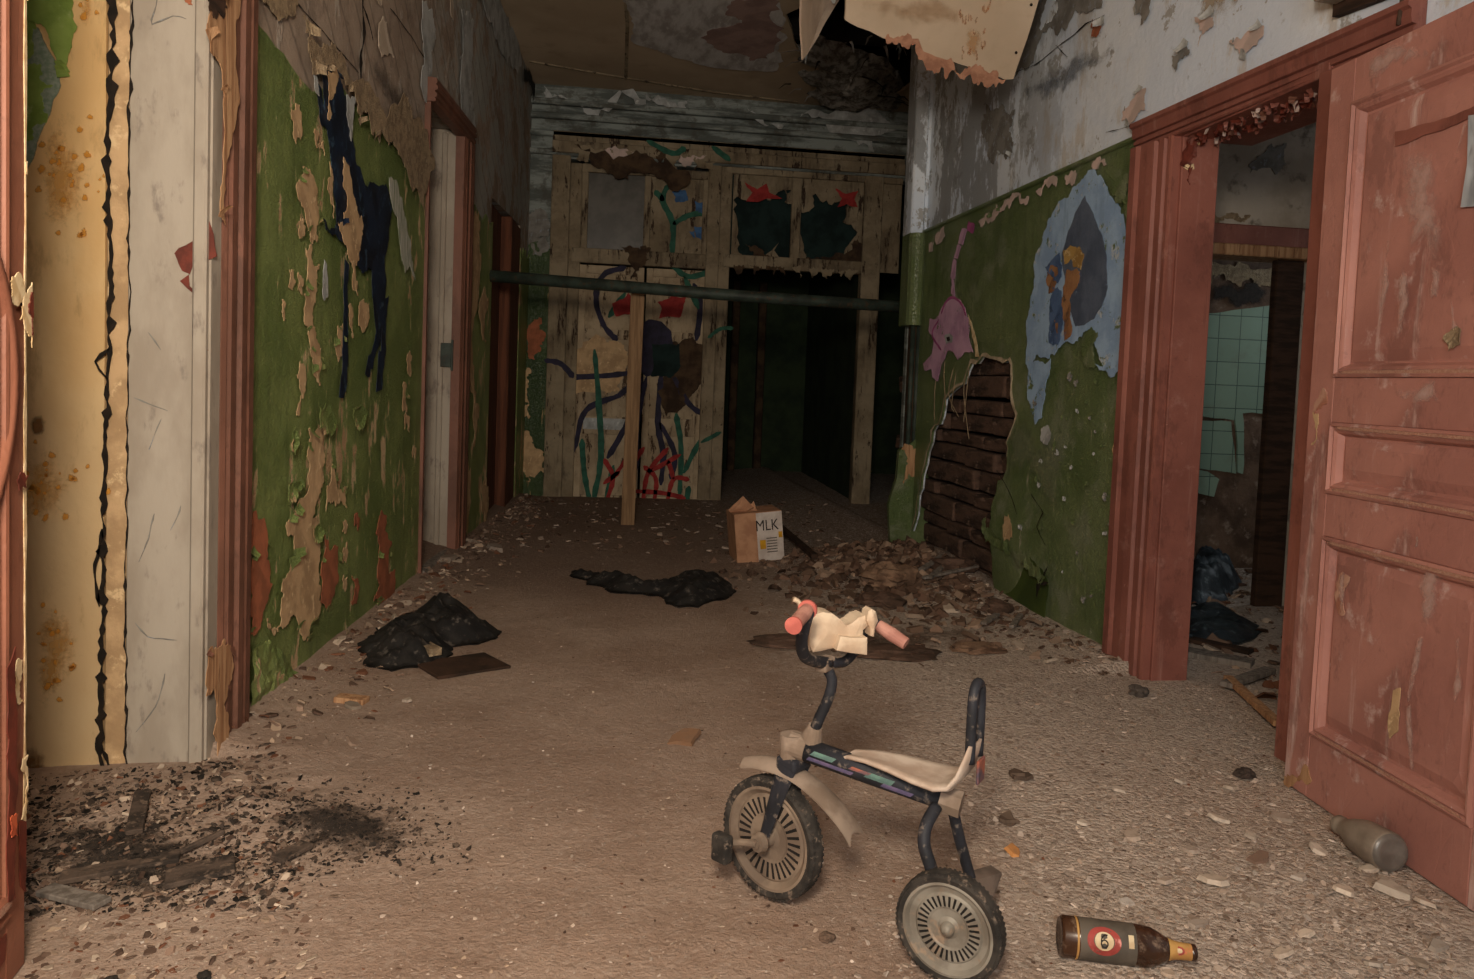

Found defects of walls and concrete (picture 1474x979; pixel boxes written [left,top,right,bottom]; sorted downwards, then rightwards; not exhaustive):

flaking render [1015,0,1104,77]
flaking render [1133,0,1151,25]
flaking render [1172,5,1214,72]
flaking render [1229,19,1264,60]
flaking render [981,103,1015,164]
peeling [1180,88,1318,184]
peeling [978,156,1107,227]
peeling [1211,261,1272,287]
peeling [250,0,476,641]
spalling [895,353,1043,579]
peeling [1034,372,1114,501]
peeling [1006,551,1103,618]